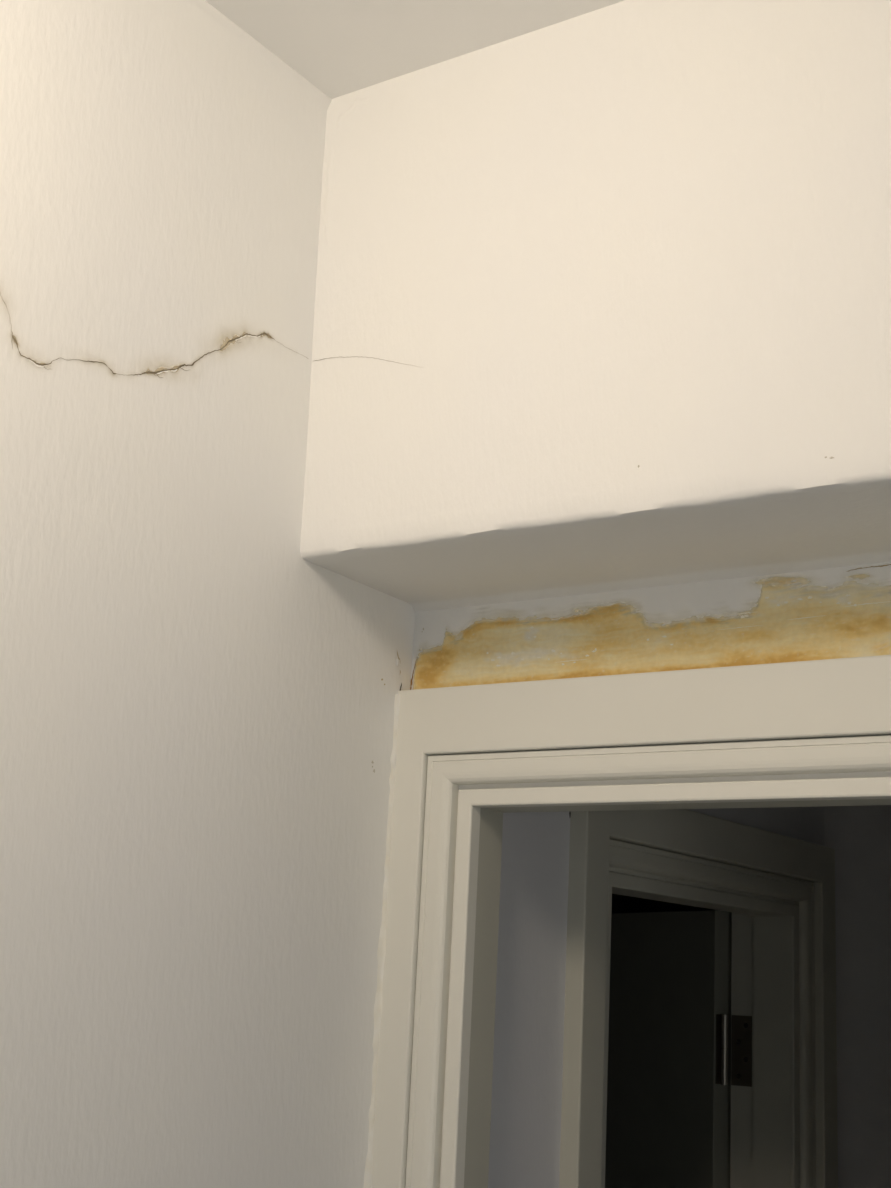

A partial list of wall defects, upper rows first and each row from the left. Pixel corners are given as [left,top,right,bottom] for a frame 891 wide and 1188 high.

crack [2,299,417,378]